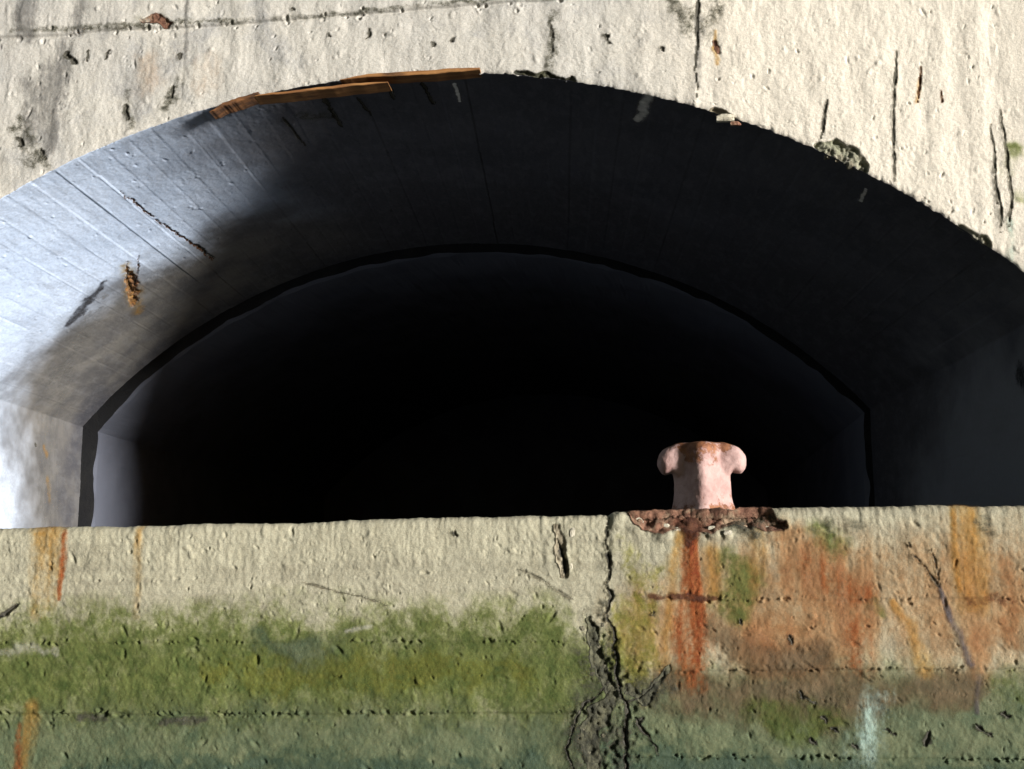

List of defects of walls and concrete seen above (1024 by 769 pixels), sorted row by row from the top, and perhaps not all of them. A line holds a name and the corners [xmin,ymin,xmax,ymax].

crack [123,193,214,260]
spalling [814,139,868,173]
crack [892,51,922,177]
crack [990,109,1014,233]
leakage [0,639,1024,769]
crack [565,518,664,769]
corrosion [651,530,717,680]